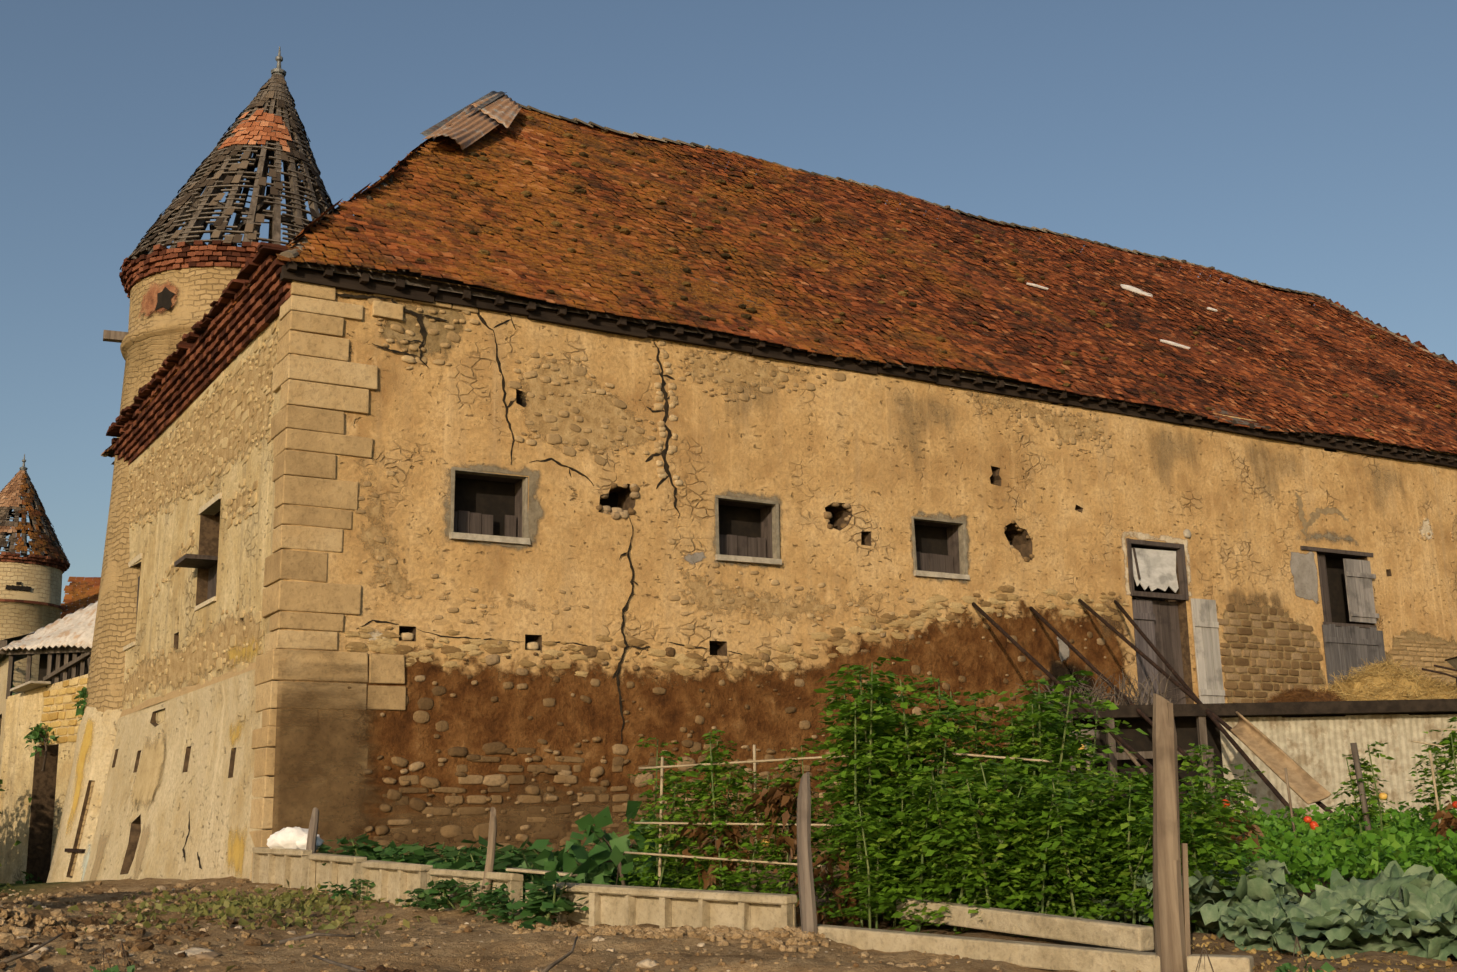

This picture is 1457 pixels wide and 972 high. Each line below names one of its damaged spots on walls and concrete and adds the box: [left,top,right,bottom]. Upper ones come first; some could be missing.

crack [336,293,594,486]
flaking render [508,352,657,520]
crack [645,339,683,518]
crack [613,517,650,744]
flaking render [344,471,1135,866]